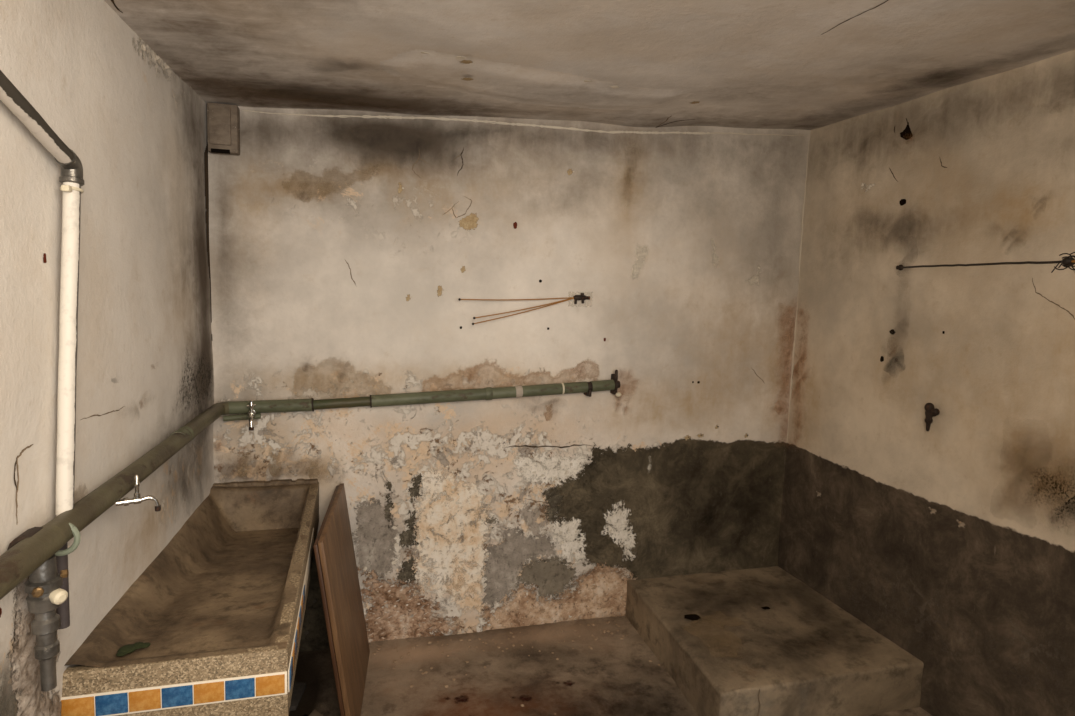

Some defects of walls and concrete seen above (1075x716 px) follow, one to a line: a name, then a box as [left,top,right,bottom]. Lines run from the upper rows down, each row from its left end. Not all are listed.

crack [821,0,888,35]
crack [1032,278,1075,320]
peeling [352,451,637,643]